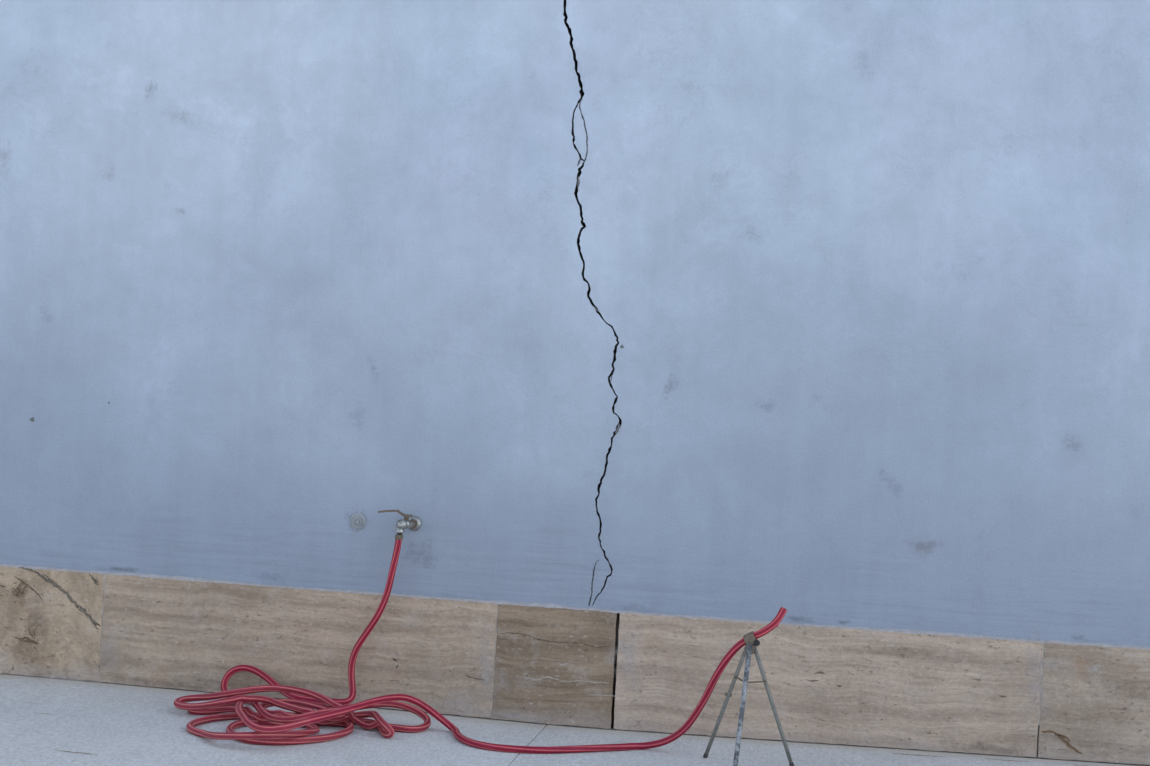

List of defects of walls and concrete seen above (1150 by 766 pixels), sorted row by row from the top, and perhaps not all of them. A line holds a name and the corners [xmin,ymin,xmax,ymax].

crack [563,0,622,605]